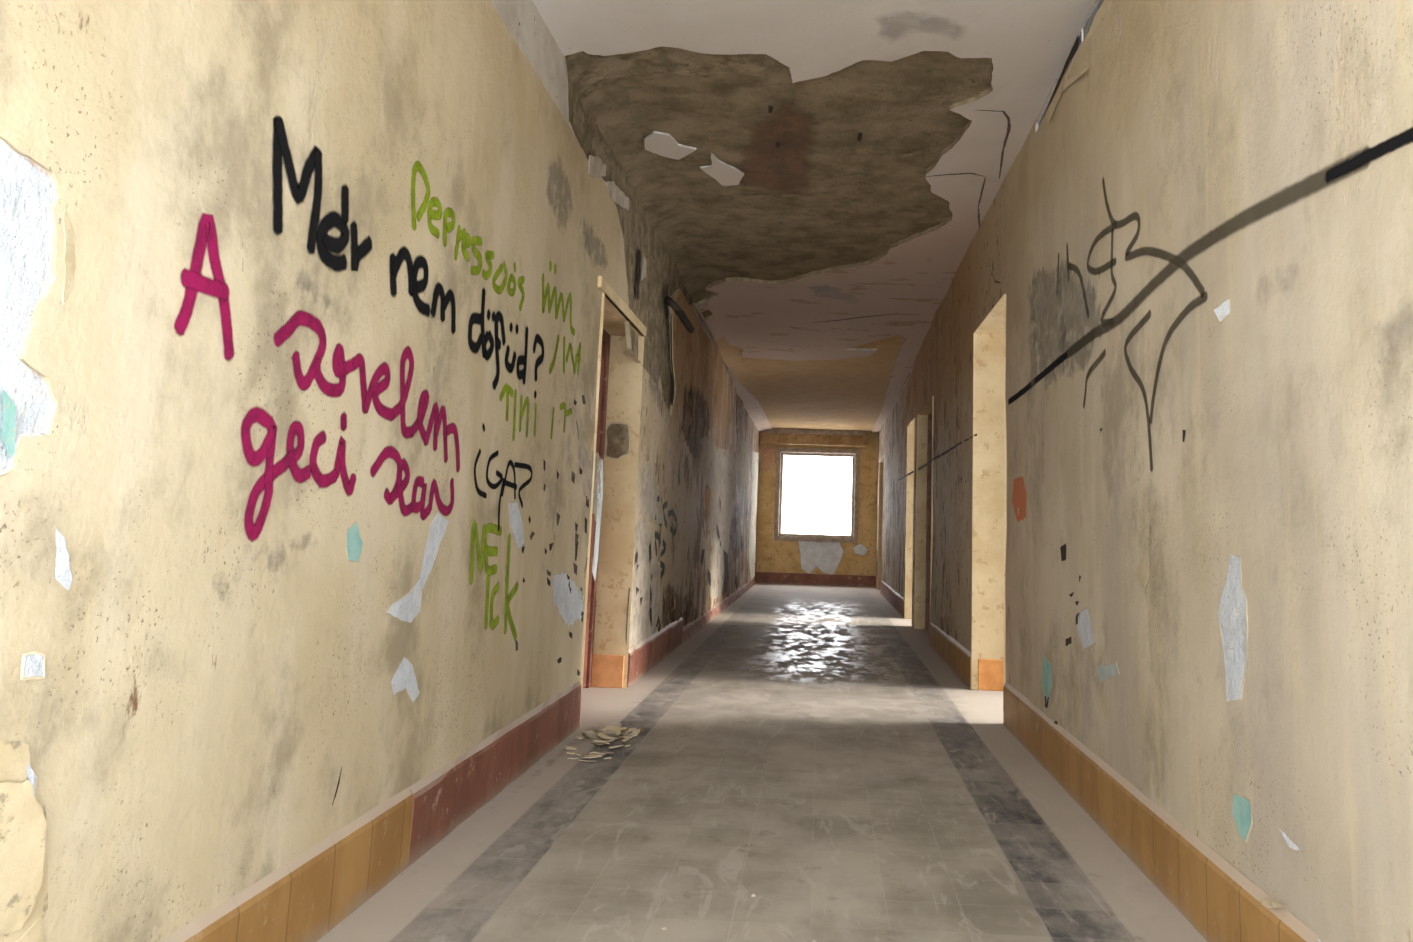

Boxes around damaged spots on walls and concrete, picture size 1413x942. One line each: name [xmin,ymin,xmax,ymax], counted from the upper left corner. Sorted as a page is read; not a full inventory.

flaking render [1036,0,1104,132]
flaking render [0,136,77,480]
peeling [55,529,72,590]
peeling [20,651,46,680]
peeling [0,740,48,942]